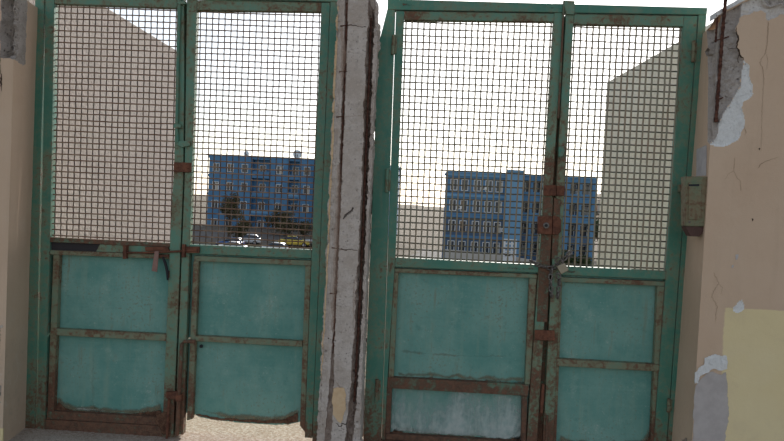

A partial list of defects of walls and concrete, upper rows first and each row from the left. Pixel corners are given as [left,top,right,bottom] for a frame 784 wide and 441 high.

spalling [0,0,28,66]
spalling [696,0,784,176]
crack [730,22,769,106]
spalling [332,3,348,353]
spalling [353,17,372,402]
flaking render [694,354,728,383]